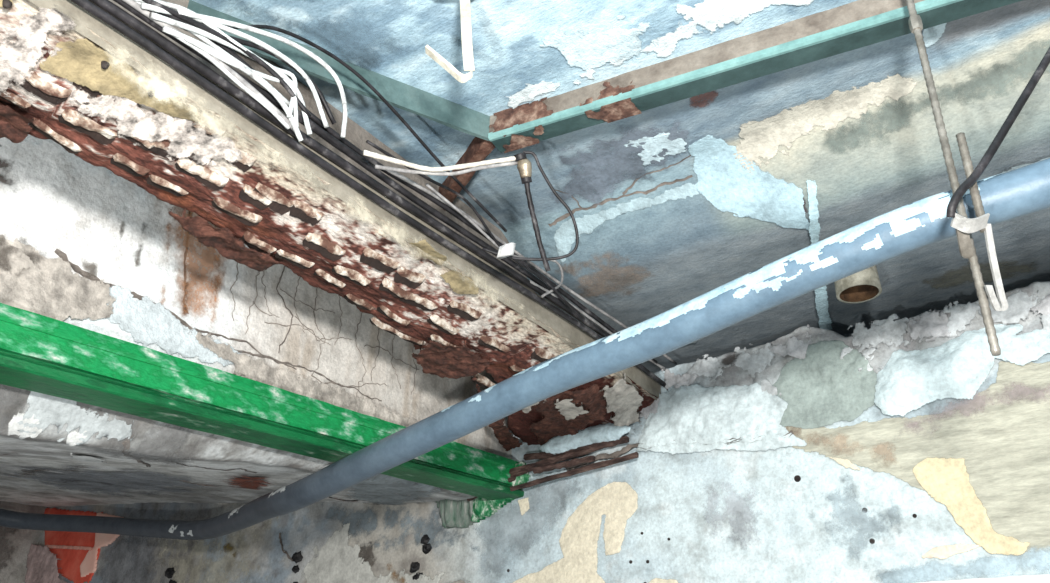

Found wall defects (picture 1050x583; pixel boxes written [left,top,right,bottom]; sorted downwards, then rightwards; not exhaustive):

rust [0,105,34,143]
rust [167,207,279,314]
spalling [0,235,418,427]
crack [55,247,419,401]
rust [412,340,490,393]
peeling [8,391,134,464]
rust [489,418,523,451]
peeling [522,399,589,420]
rust [529,383,607,446]
peeling [602,290,1050,552]
rust [207,475,270,490]
peeling [25,544,68,583]